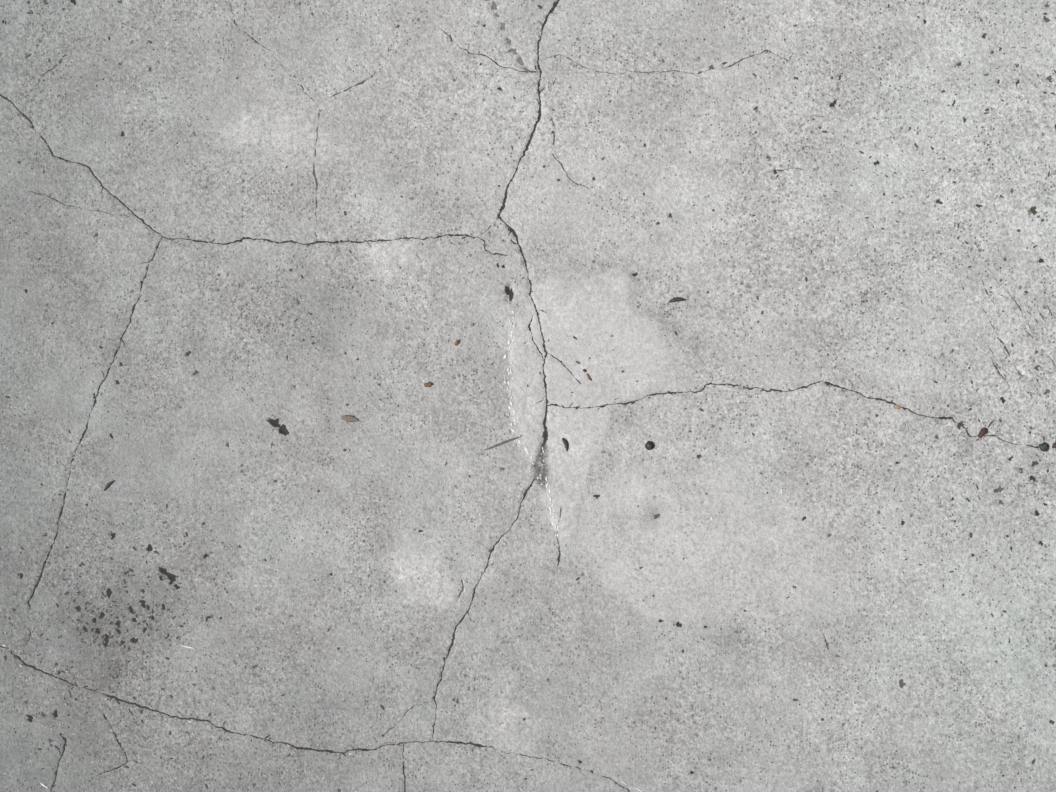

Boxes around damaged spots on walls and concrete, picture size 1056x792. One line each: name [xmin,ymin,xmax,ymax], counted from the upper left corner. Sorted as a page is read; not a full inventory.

crack [229,2,376,215]
crack [0,94,508,462]
crack [424,0,1017,704]
crack [27,473,70,611]
crack [1,645,493,792]